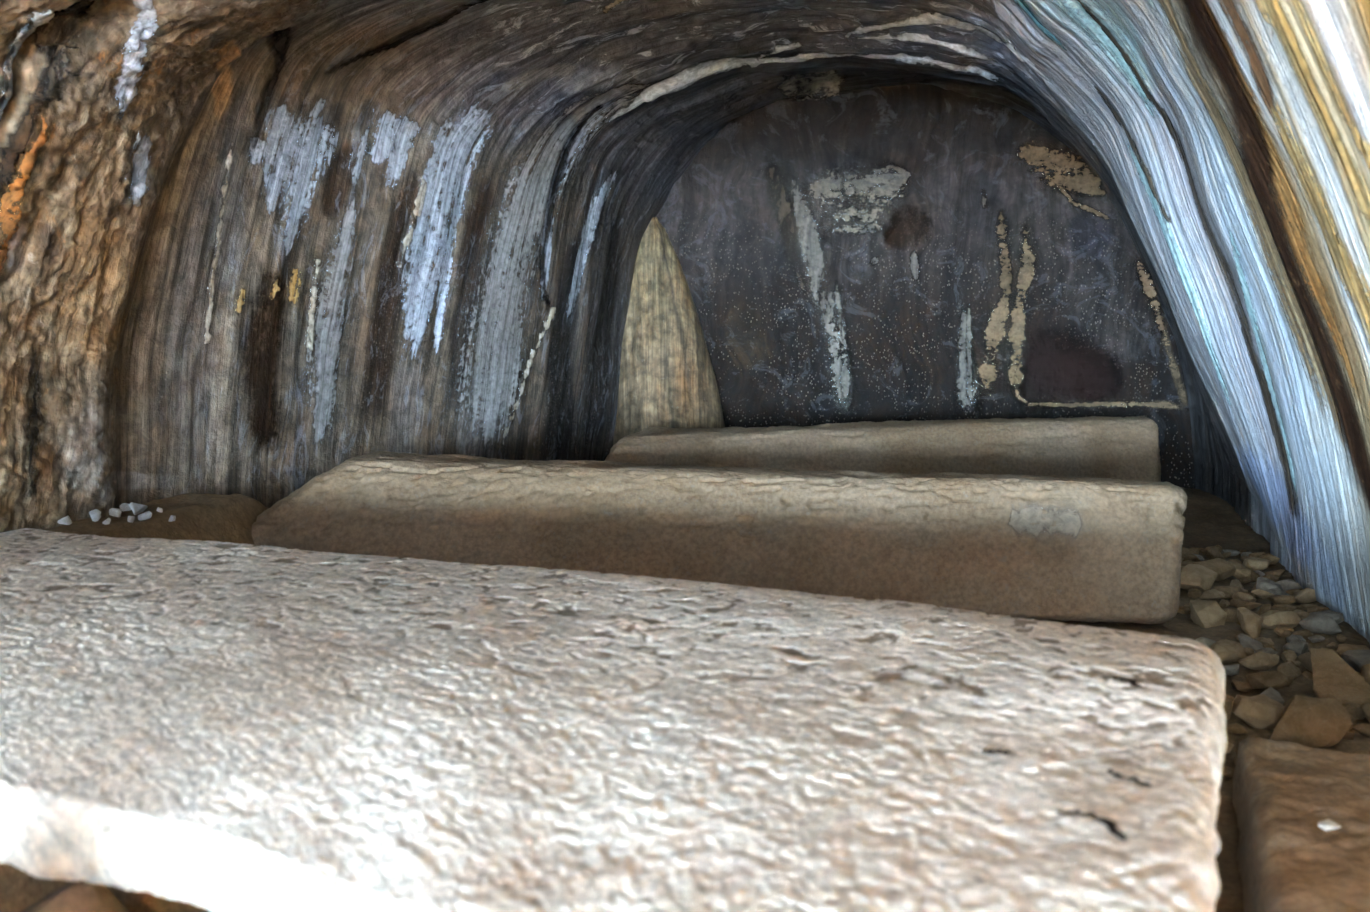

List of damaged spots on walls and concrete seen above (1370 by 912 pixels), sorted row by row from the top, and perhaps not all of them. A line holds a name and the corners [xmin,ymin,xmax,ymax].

water stain [0,0,94,120]
water stain [114,0,159,119]
corrosion [0,113,48,279]
water stain [130,136,153,206]
water stain [249,98,421,445]
water stain [401,104,494,359]
water stain [540,98,617,316]
water stain [765,162,851,408]
water stain [869,206,933,280]
water stain [26,362,44,496]